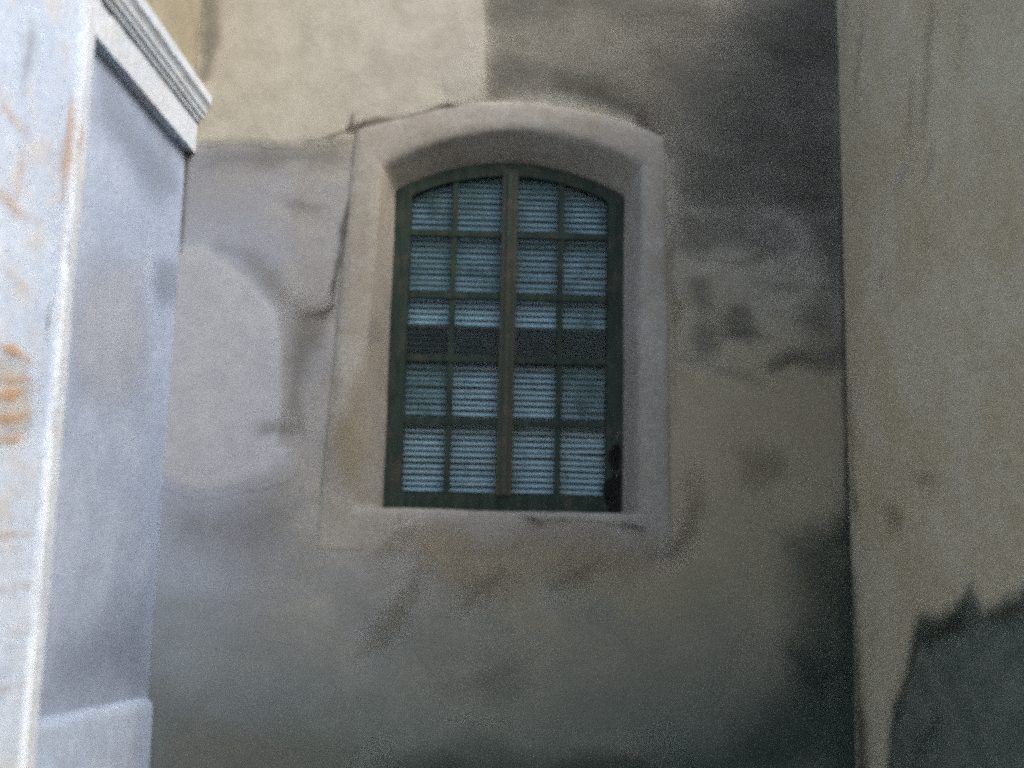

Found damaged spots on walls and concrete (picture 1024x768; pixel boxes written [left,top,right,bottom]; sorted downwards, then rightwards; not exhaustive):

water stain [731,522,862,768]